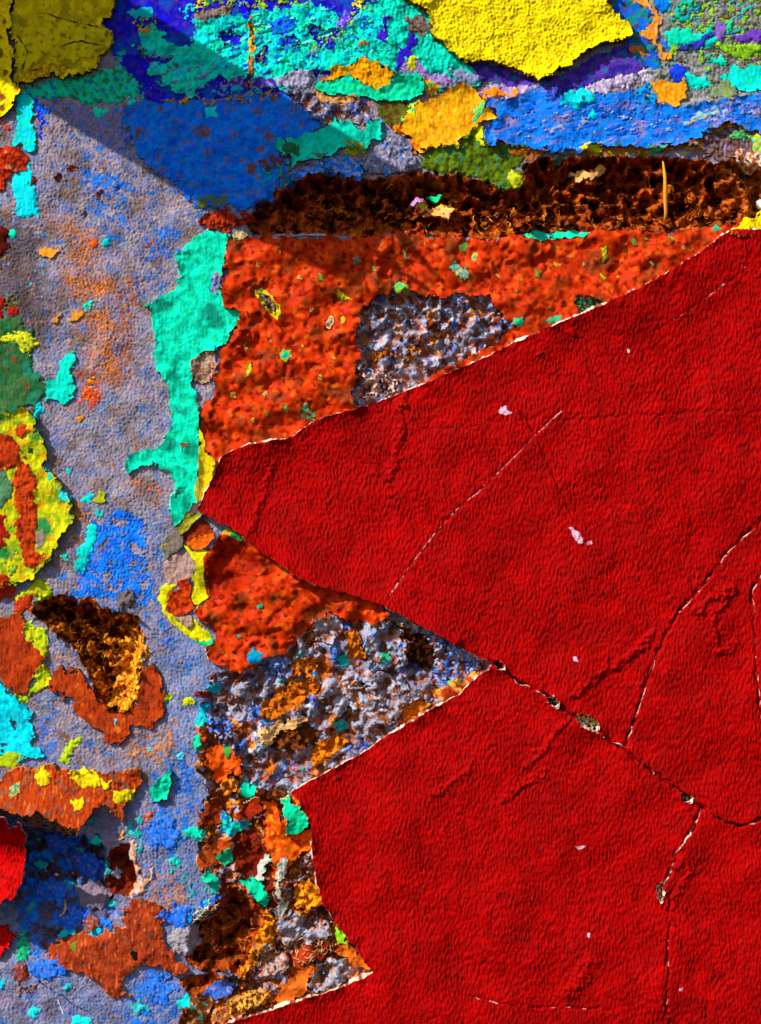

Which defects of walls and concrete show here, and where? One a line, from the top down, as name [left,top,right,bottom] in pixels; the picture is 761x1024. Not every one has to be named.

crack [432,412,569,511]
crack [504,515,761,1024]